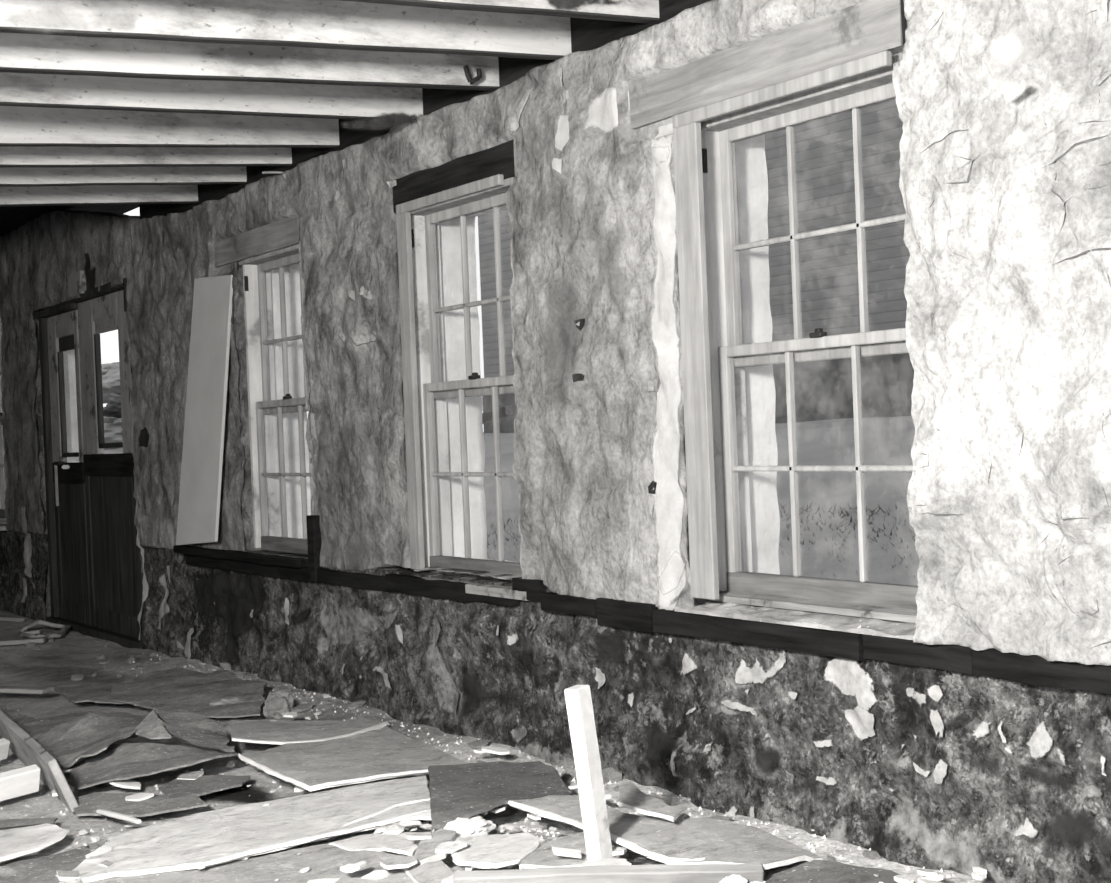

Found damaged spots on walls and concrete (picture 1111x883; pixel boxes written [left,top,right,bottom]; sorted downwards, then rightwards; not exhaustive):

leakage [548,0,616,10]
crack [1085,0,1110,23]
flaking render [585,87,630,132]
flaking render [552,115,569,174]
crack [917,109,982,207]
crack [1038,59,1111,287]